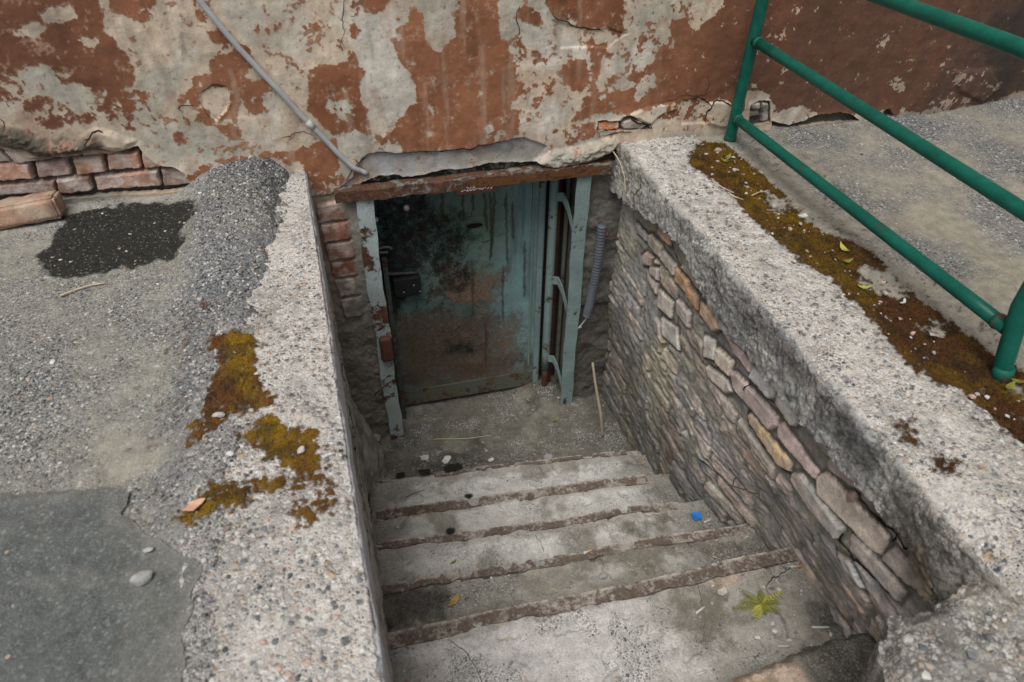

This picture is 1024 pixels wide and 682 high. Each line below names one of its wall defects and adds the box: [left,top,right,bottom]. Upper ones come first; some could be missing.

crack [554,14,604,32]
peeling [880,25,1024,115]
peeling [0,0,866,205]
crack [669,79,731,123]
crack [767,112,856,126]
corrosion [454,165,609,191]